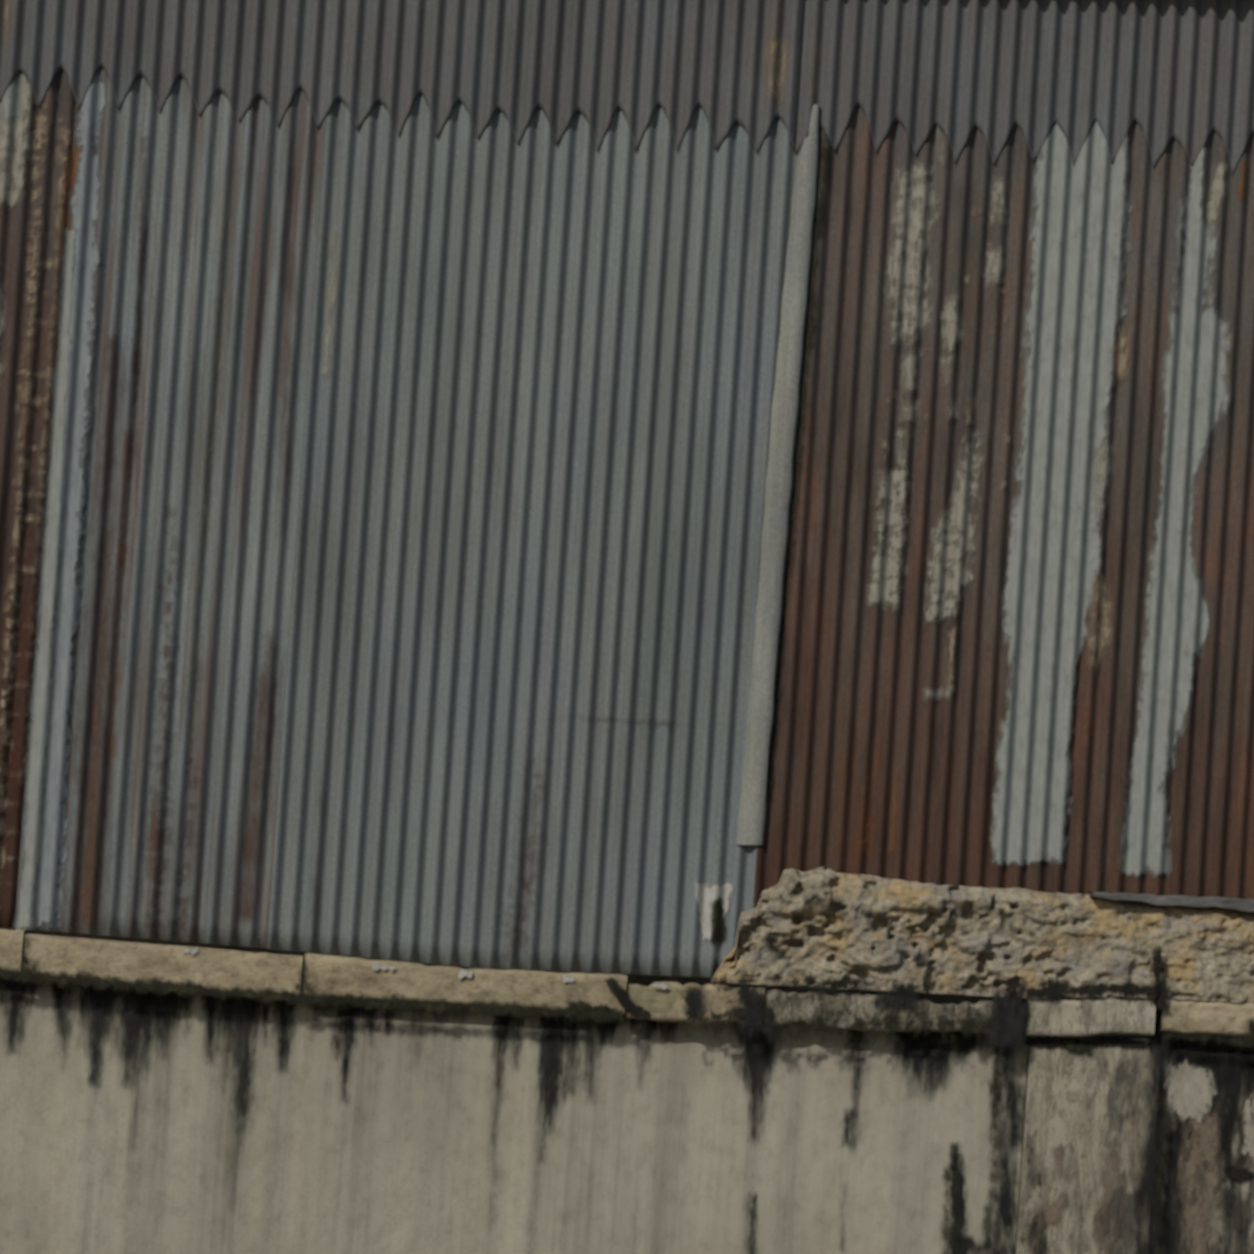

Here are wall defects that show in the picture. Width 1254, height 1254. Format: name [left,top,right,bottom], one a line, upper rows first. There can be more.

peeling [0,73,32,207]
rust [0,89,83,745]
peeling [13,67,106,930]
peeling [867,164,963,610]
peeling [990,121,1131,866]
peeling [1121,148,1245,876]
leakage [0,977,293,1117]
leakage [314,1003,393,1094]
leakage [539,1011,675,1123]
leakage [971,1046,1047,1254]
leakage [1101,1006,1254,1254]
spalling [1162,1058,1219,1254]